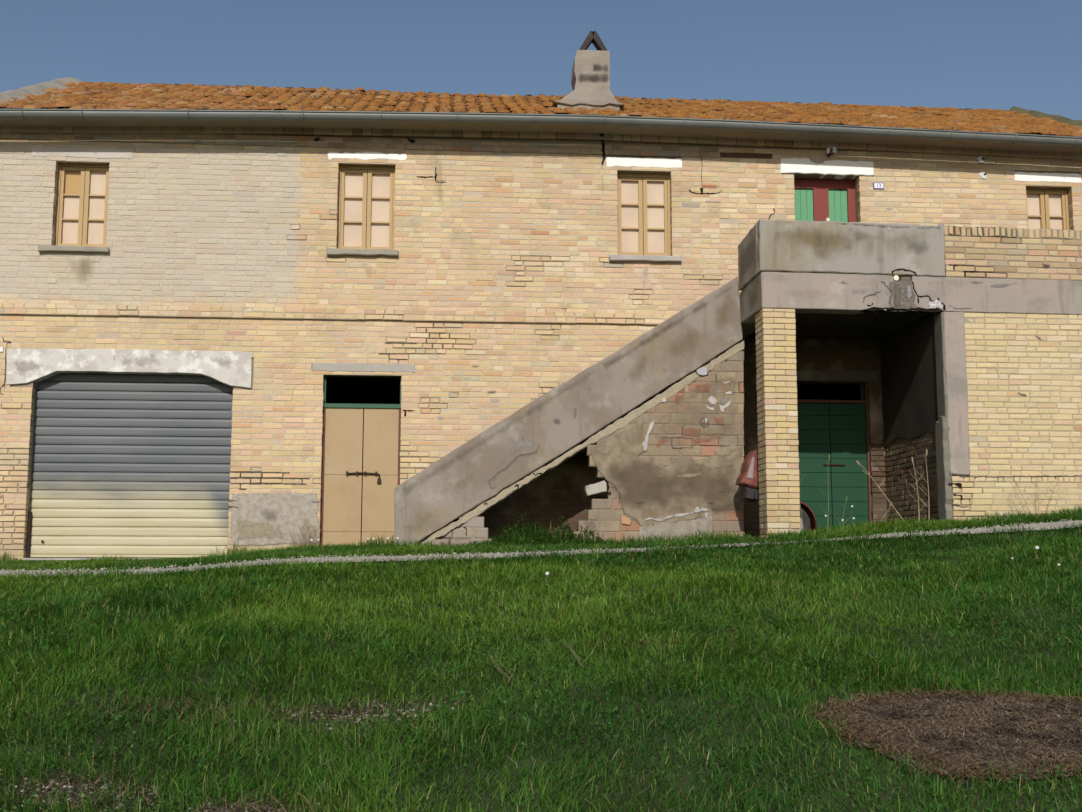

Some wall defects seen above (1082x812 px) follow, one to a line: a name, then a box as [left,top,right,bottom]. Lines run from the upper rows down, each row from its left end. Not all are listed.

spalling [860,268,946,314]
peeling [705,380,733,412]
flaking render [591,418,742,542]